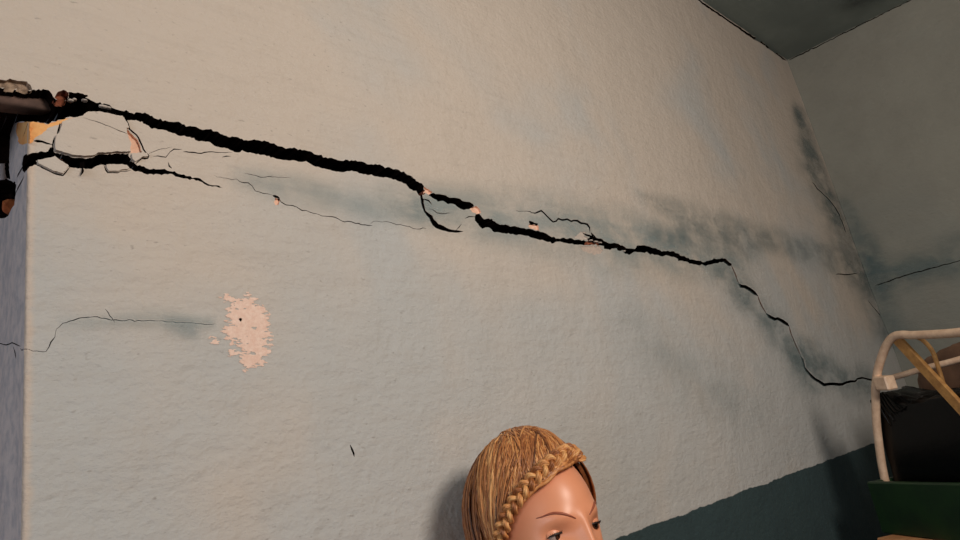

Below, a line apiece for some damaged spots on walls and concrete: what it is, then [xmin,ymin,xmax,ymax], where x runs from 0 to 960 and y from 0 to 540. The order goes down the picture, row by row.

flaking render [0,79,88,173]
spalling [0,163,16,218]
crack [0,88,872,386]
leakage [424,199,454,211]
crack [836,260,960,315]
peeling [209,292,274,372]